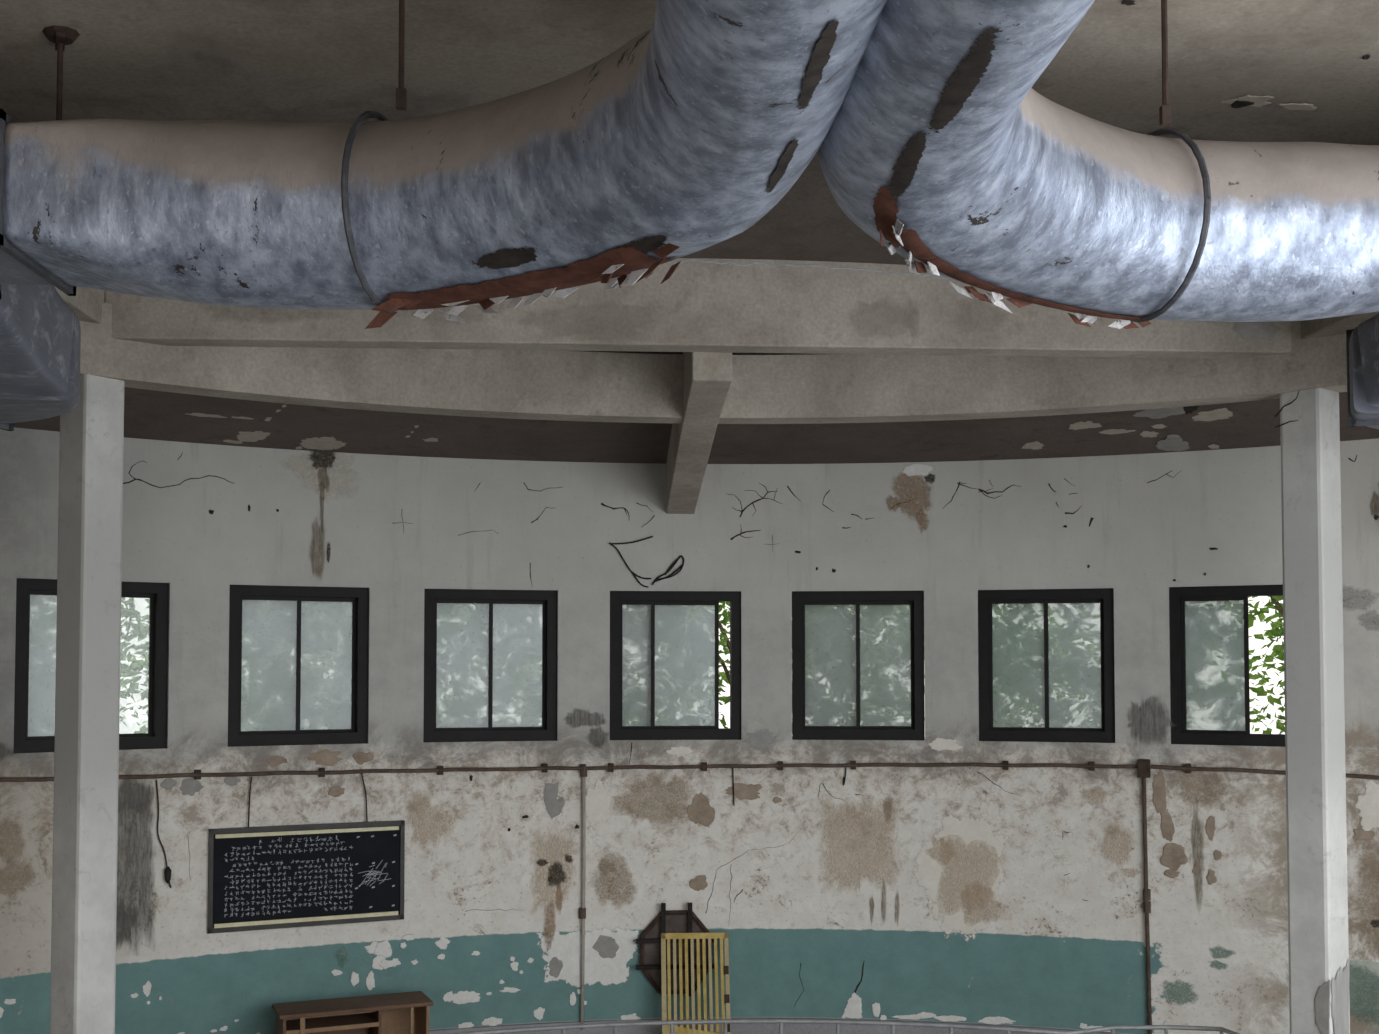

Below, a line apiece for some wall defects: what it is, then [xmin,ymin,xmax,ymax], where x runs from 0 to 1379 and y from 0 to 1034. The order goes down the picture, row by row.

spalling [1068,405,1233,451]
leakage [299,451,351,575]
leakage [118,779,151,813]
leakage [824,798,899,921]
leakage [911,810,1009,942]
leakage [116,902,134,945]
peeling [435,936,450,960]
peeling [443,927,641,1005]
peeling [458,1017,503,1028]
peeling [533,1007,545,1020]